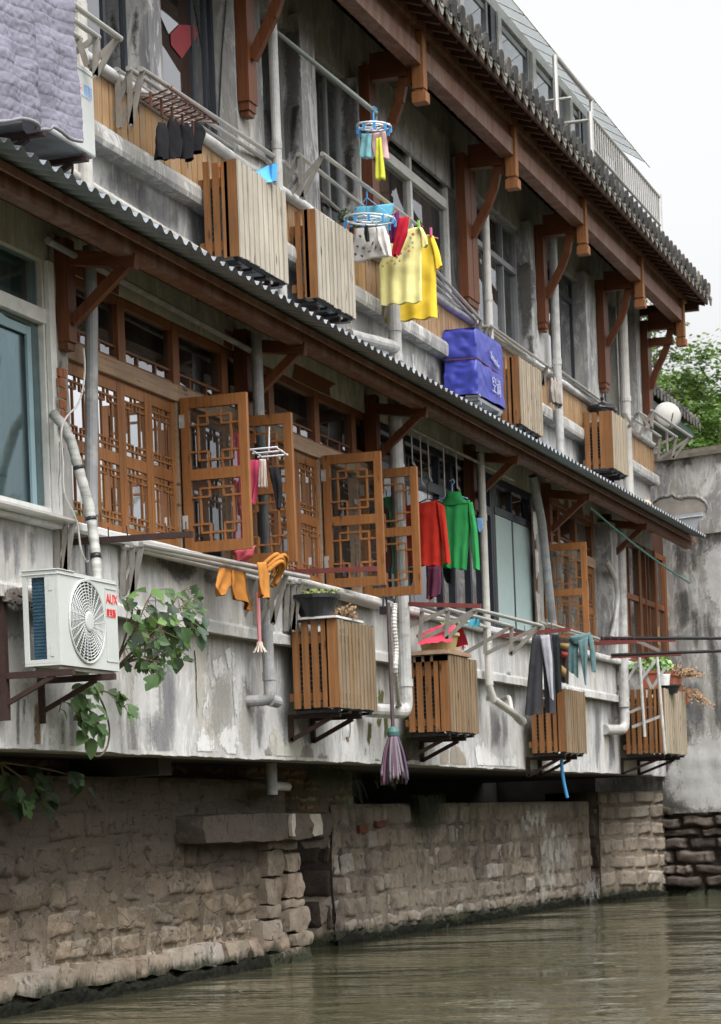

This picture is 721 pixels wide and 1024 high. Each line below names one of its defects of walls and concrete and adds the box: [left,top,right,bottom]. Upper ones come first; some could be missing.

leakage [130,669,175,751]
peeling [196,647,254,755]
leakage [522,810,573,900]